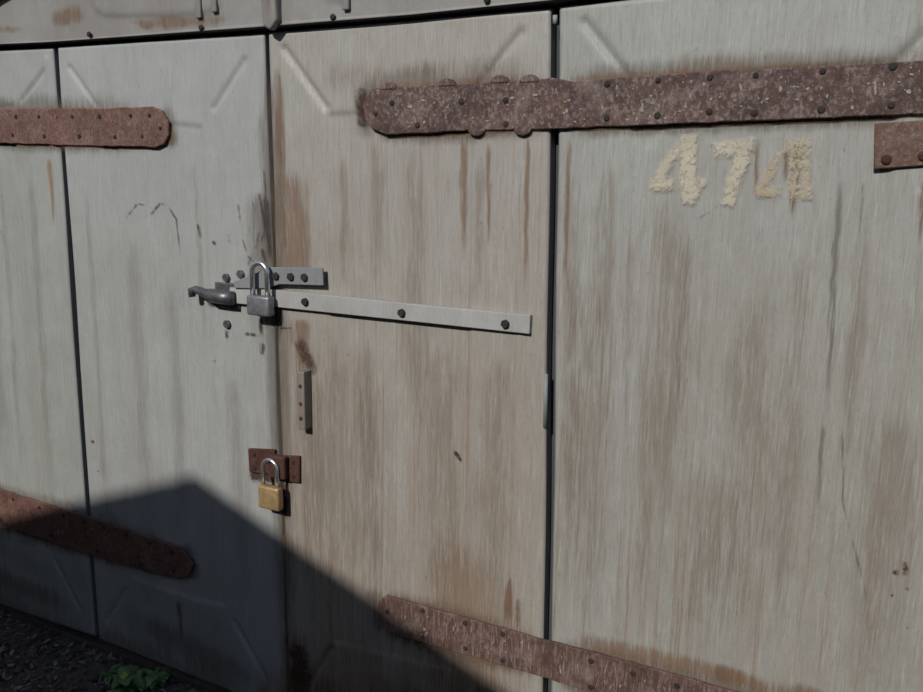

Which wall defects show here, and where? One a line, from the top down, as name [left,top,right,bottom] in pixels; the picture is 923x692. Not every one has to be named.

rust [356,89,367,126]
rust [296,341,314,373]